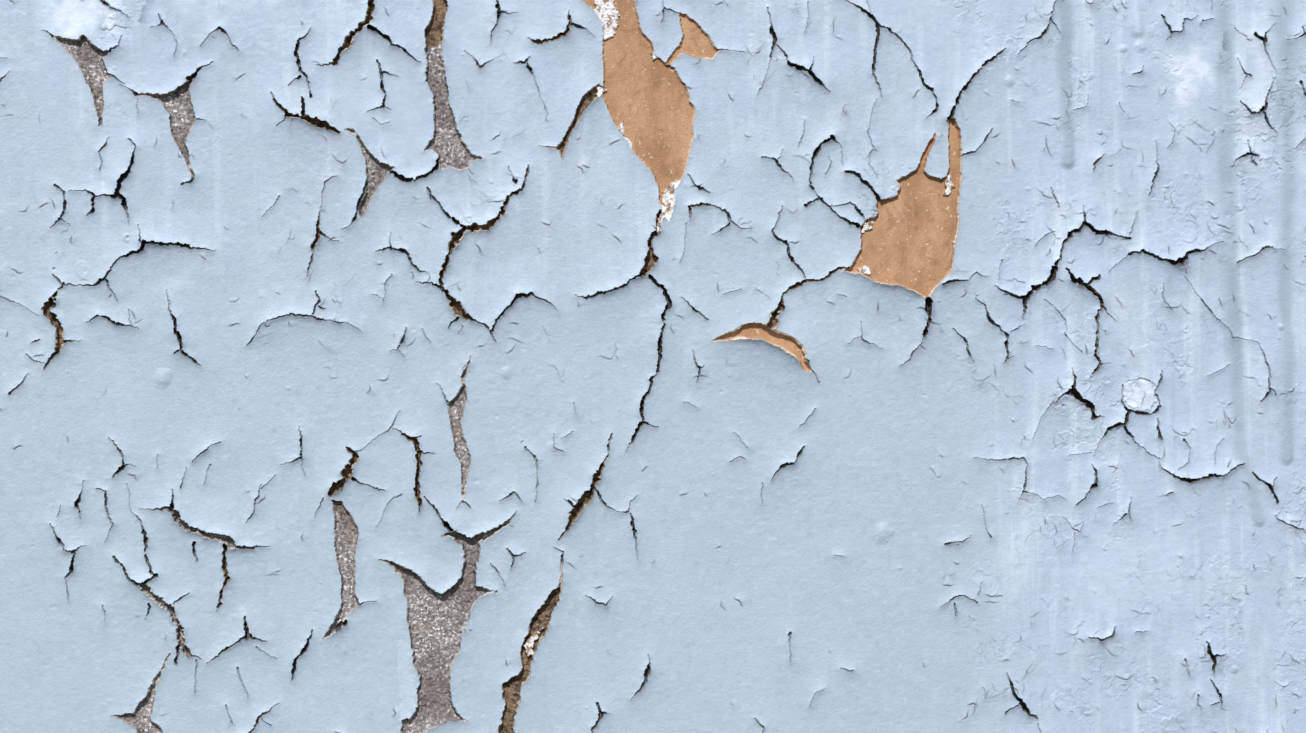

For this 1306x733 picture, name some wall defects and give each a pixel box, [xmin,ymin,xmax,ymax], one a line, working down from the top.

peeling [41,30,214,187]
peeling [268,0,485,230]
peeling [538,0,745,236]
crack [1159,0,1306,166]
crack [0,136,216,396]
crack [245,0,1095,562]
peeling [708,117,976,386]
crack [952,130,1306,582]
crack [46,437,222,603]
crack [193,611,356,733]
peeling [377,354,518,733]
peeling [495,546,566,733]